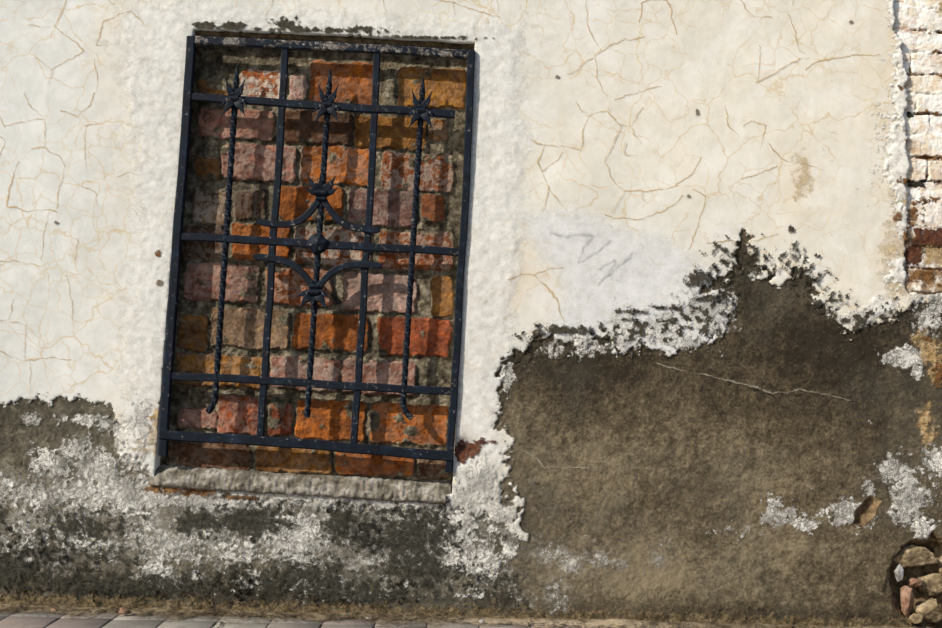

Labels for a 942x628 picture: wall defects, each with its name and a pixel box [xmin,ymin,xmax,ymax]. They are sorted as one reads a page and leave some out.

crack [0,1,143,266]
crack [533,0,776,249]
crack [726,111,814,179]
crack [744,4,880,82]
spalling [820,0,942,384]
peeling [0,393,626,616]
damp [0,228,942,628]
peeling [499,358,516,399]
crack [507,267,564,320]
peeling [525,224,838,366]
crack [657,363,851,417]
spalling [706,442,942,628]